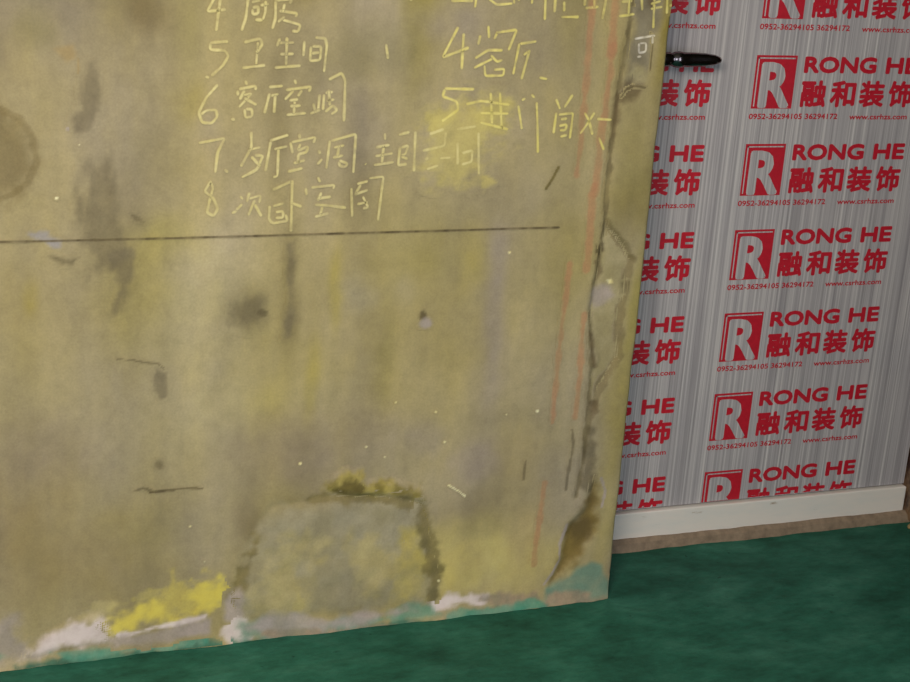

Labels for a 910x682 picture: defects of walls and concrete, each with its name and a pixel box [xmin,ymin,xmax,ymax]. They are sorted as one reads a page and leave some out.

crack [616,0,654,99]
water stain [0,96,51,221]
crack [572,142,639,500]
water stain [0,564,550,672]